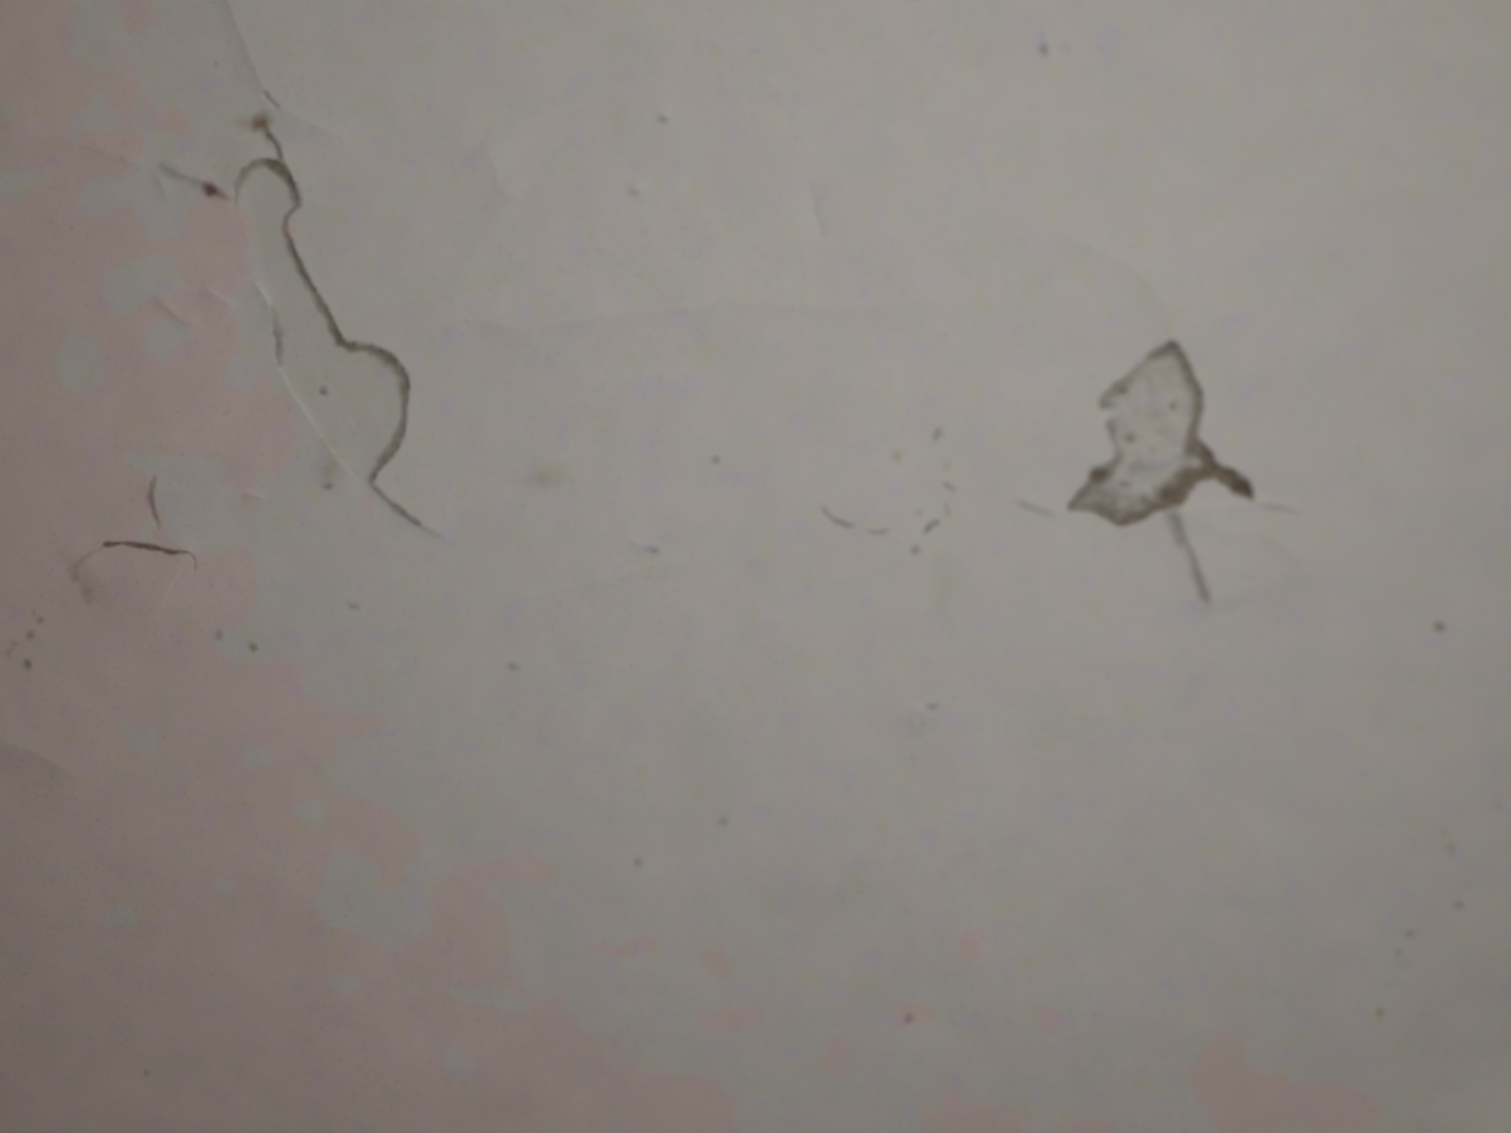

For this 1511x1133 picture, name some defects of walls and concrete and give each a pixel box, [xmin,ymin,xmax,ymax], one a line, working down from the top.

peeling [150,135,419,500]
spalling [1066,323,1268,540]